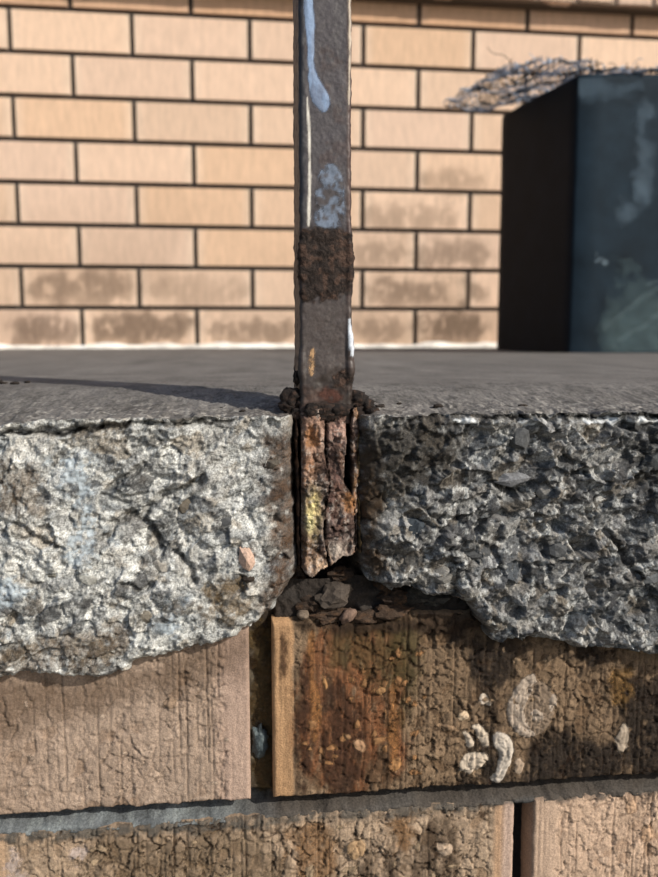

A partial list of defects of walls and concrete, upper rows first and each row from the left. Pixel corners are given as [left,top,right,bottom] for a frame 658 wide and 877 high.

rust [293,420,301,566]
damp [311,677,328,721]
peeling [302,734,346,765]
rust [296,653,366,794]
damp [329,614,658,785]